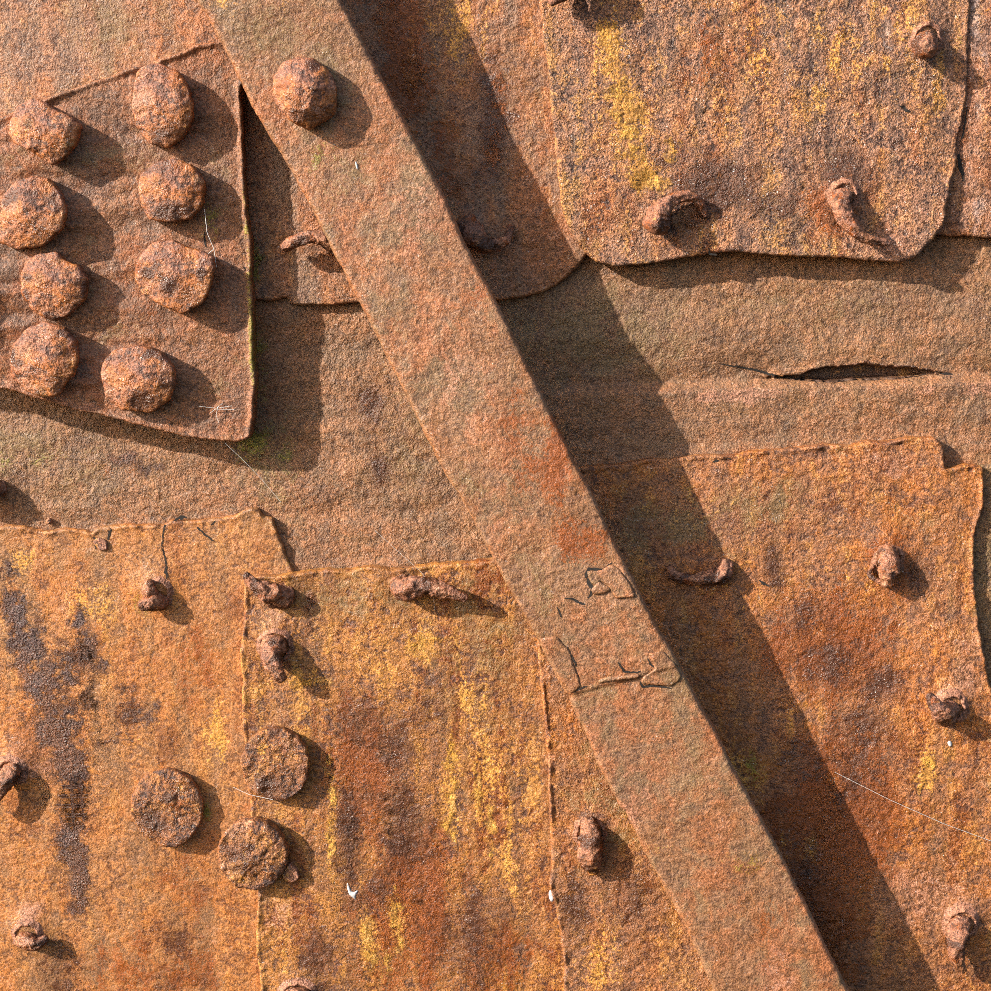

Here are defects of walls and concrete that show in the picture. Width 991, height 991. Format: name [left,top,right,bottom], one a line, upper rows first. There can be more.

rust [597,18,671,190]
peeling [587,564,635,599]
peeling [599,651,681,686]
rust [773,607,837,680]
rust [0,560,161,916]
rust [322,760,337,805]
rust [440,736,459,842]
rust [472,769,496,833]
rust [808,726,887,847]
rust [282,862,300,883]
rust [325,818,512,984]
rust [795,867,854,965]